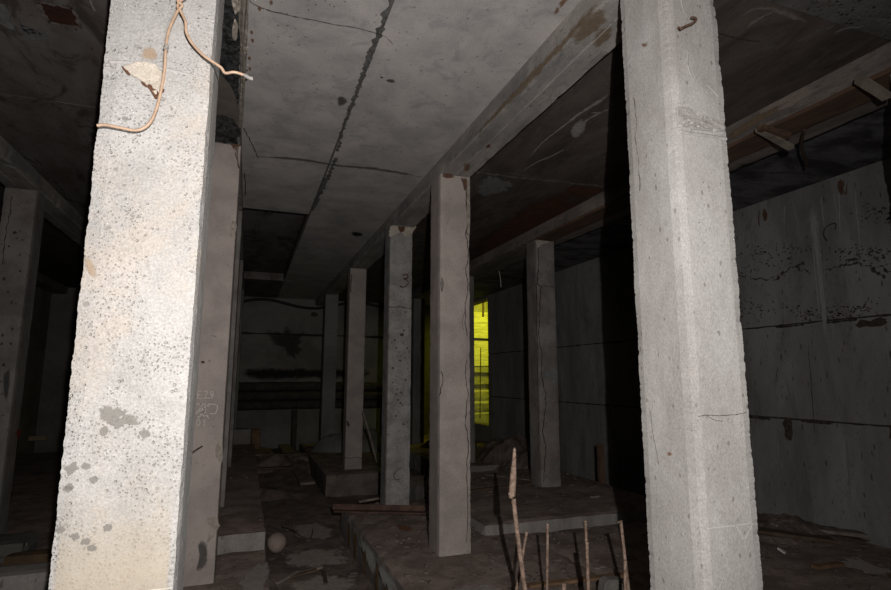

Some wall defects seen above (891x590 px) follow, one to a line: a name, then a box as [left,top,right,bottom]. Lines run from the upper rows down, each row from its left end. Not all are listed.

crack [249,0,393,44]
spalling [122,61,167,101]
crack [535,240,554,482]